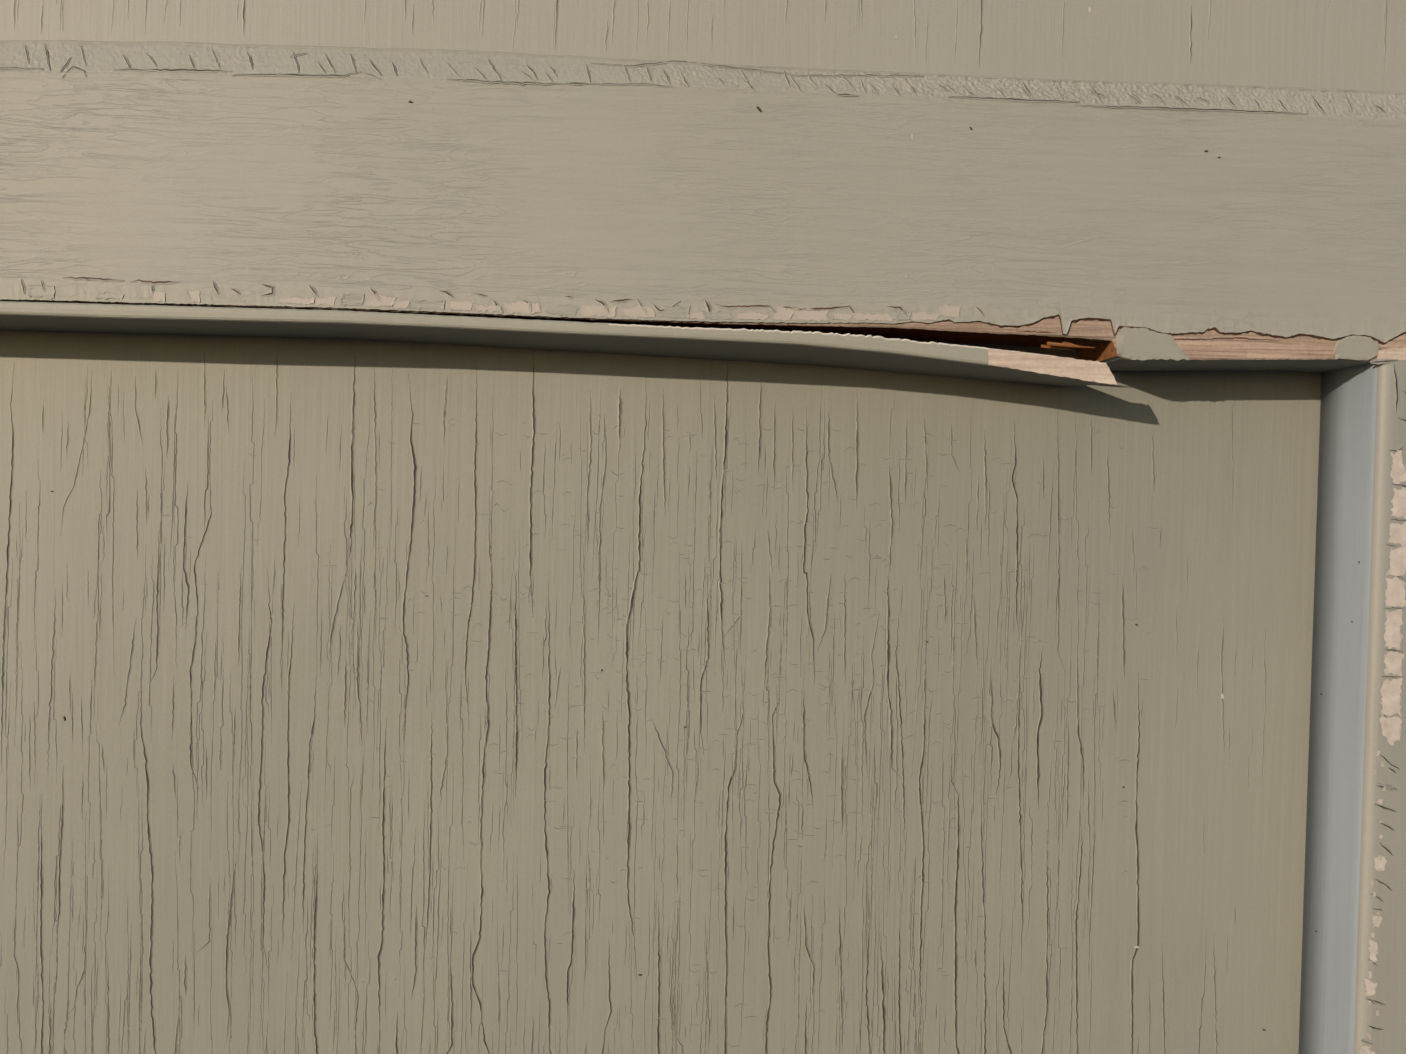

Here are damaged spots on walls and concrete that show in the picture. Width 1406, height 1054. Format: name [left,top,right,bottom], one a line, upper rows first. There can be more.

peeling [20,275,241,303]
peeling [261,283,985,322]
peeling [988,327,1281,385]
peeling [1334,335,1406,361]
crack [0,351,1267,1054]
peeling [1360,446,1406,1054]